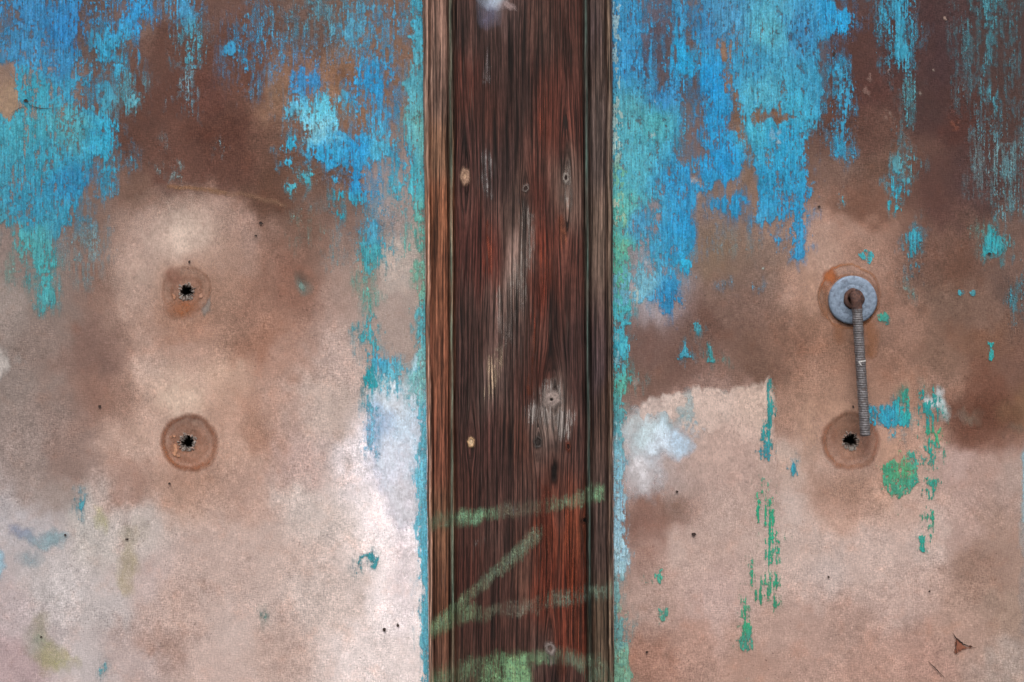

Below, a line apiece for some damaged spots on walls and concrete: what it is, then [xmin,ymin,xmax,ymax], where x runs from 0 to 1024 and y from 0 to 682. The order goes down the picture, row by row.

peeling [0,0,207,318]
peeling [222,0,429,682]
peeling [612,0,871,682]
corrosion [818,263,881,328]
peeling [874,0,922,130]
peeling [888,152,915,212]
peeling [903,227,923,294]
peeling [951,0,1024,259]
peeling [868,386,946,553]